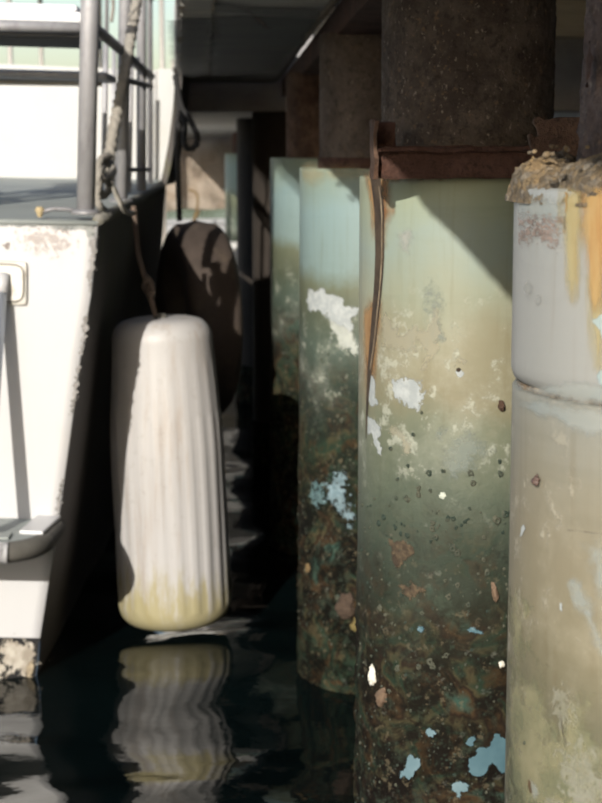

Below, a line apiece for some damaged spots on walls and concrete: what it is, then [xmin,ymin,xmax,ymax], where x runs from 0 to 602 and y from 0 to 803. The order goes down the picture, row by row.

spalling [505,144,602,249]
rust [566,191,602,358]
peeling [306,288,359,354]
rust [364,303,379,374]
peeling [369,375,378,406]
peeling [390,377,426,412]
peeling [367,416,382,456]
peeling [308,472,355,529]
peeling [399,754,420,779]
peeling [466,734,506,776]
peeling [451,781,469,798]